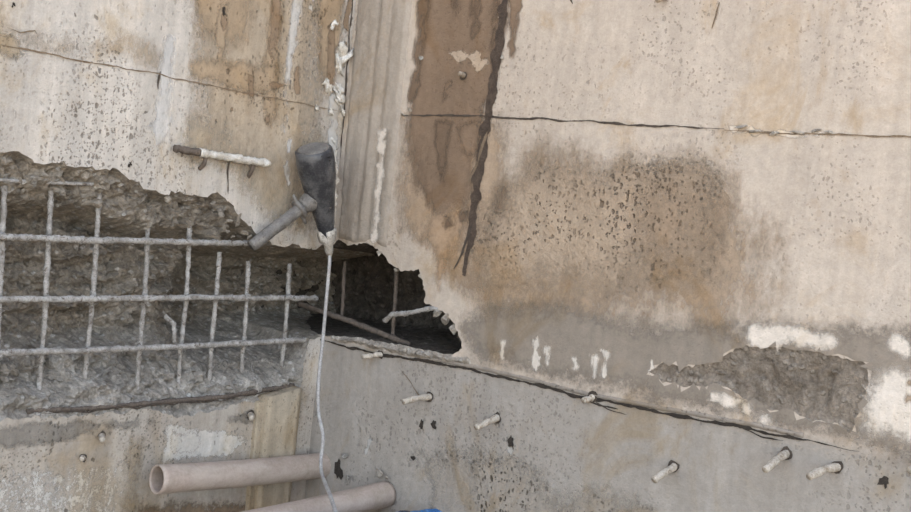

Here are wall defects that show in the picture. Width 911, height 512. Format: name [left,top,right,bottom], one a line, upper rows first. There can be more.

crack [3,0,353,157]
crack [401,114,911,138]
damp [370,128,386,243]
damp [397,0,911,455]
spalling [0,151,478,464]
crack [320,339,853,451]
spalling [649,345,869,433]
peeling [0,460,126,512]